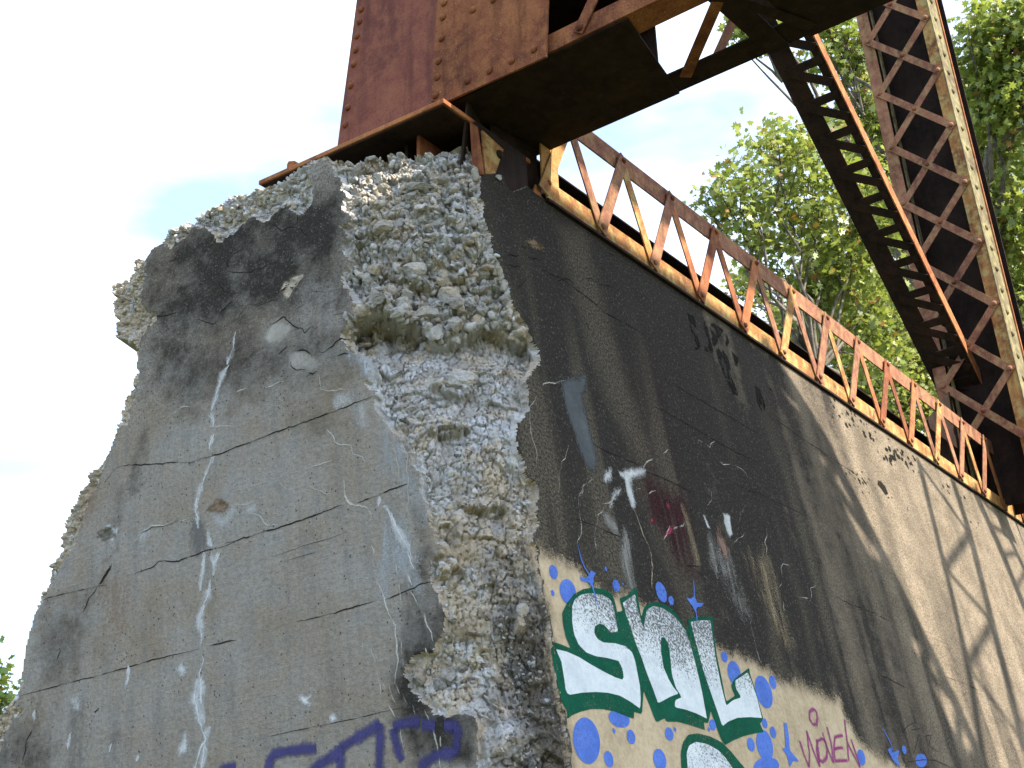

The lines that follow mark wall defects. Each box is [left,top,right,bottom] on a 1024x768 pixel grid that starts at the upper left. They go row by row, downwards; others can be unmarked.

spalling [112,256,157,357]
spalling [113,370,140,442]
crack [226,430,409,526]
spalling [160,146,572,768]
spalling [36,456,107,612]
crack [84,509,194,609]
water stain [178,332,236,768]
crack [362,546,441,768]
spalling [0,678,25,754]